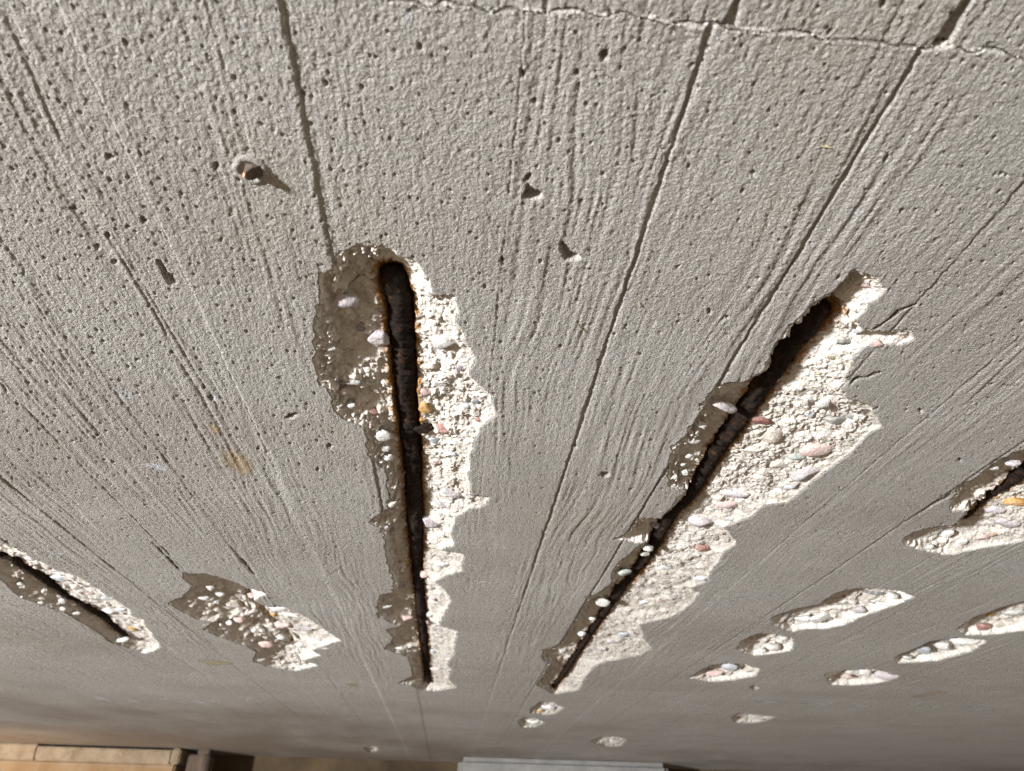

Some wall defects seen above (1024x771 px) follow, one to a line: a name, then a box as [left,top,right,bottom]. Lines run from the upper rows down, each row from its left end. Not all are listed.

crack [368,0,1024,65]
crack [875,303,916,329]
spalling [313,244,497,691]
rust [380,262,434,683]
rust [551,299,832,688]
spalling [518,269,915,727]
spalling [903,450,1024,555]
rust [963,461,1024,518]
rust [0,551,128,637]
spalling [0,544,160,654]
spalling [169,572,341,670]
spalling [825,601,1024,685]